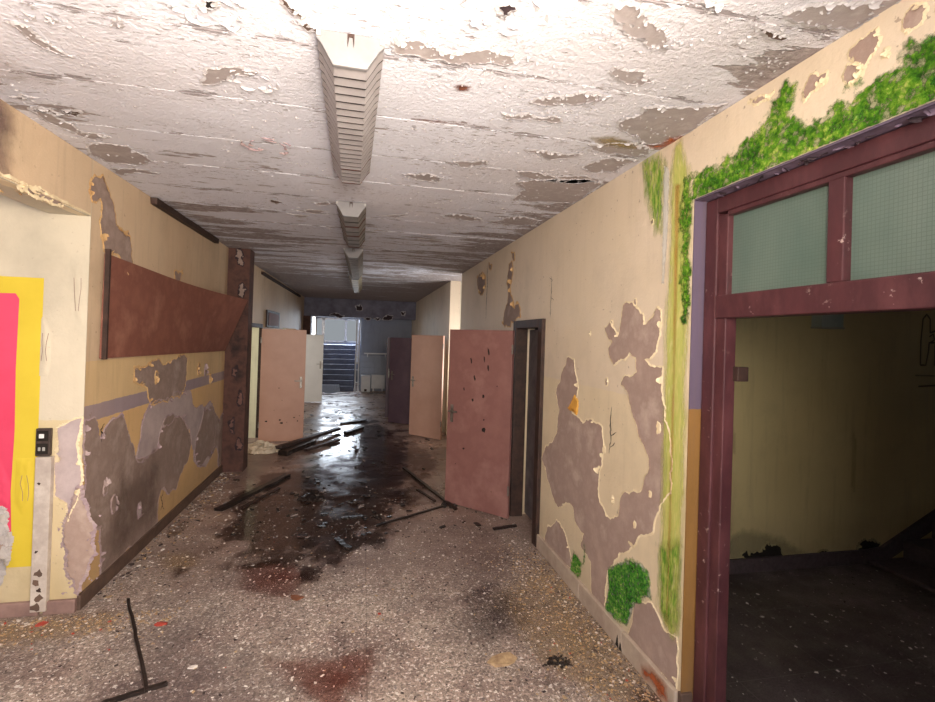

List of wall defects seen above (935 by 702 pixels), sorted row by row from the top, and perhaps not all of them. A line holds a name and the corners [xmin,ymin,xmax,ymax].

peeling [3,0,75,58]
peeling [191,65,258,87]
peeling [273,0,324,34]
peeling [389,32,519,74]
peeling [501,64,659,123]
peeling [601,0,685,54]
peeling [0,88,163,275]
peeling [509,99,729,204]
peeling [53,353,244,596]
peeling [541,298,673,609]
peeling [0,506,14,586]
peeling [619,600,680,689]